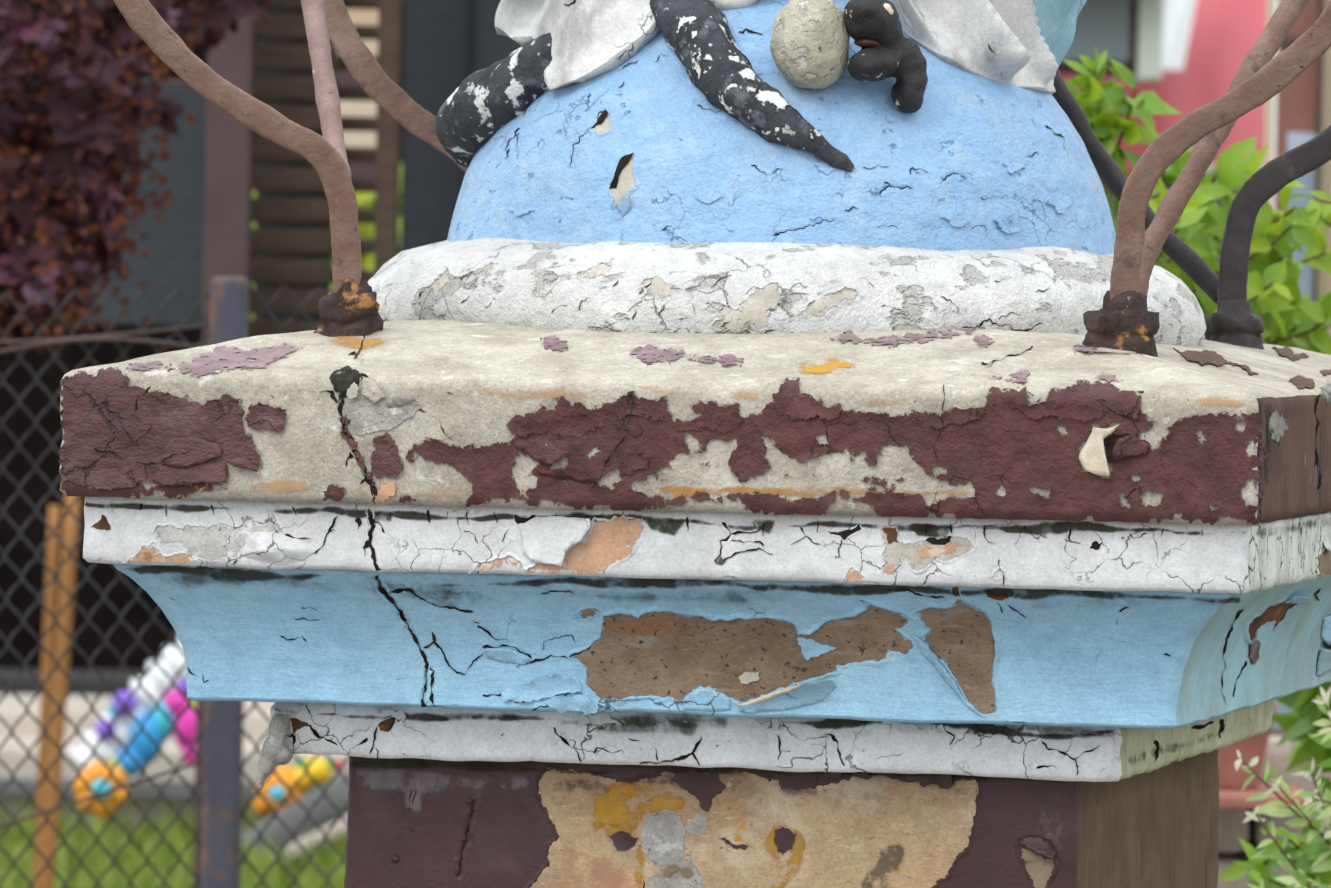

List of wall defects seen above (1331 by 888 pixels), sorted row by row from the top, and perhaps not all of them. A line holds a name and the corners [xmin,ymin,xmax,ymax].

peeling [606,151,640,217]
peeling [830,318,995,348]
peeling [58,343,303,499]
peeling [90,513,112,532]
crack [281,335,702,765]
crack [685,517,843,562]
peeling [329,365,1288,731]
crack [887,587,943,599]
peeling [1243,596,1313,665]
crack [777,734,845,766]
crack [1037,742,1099,774]
peeling [523,764,983,888]